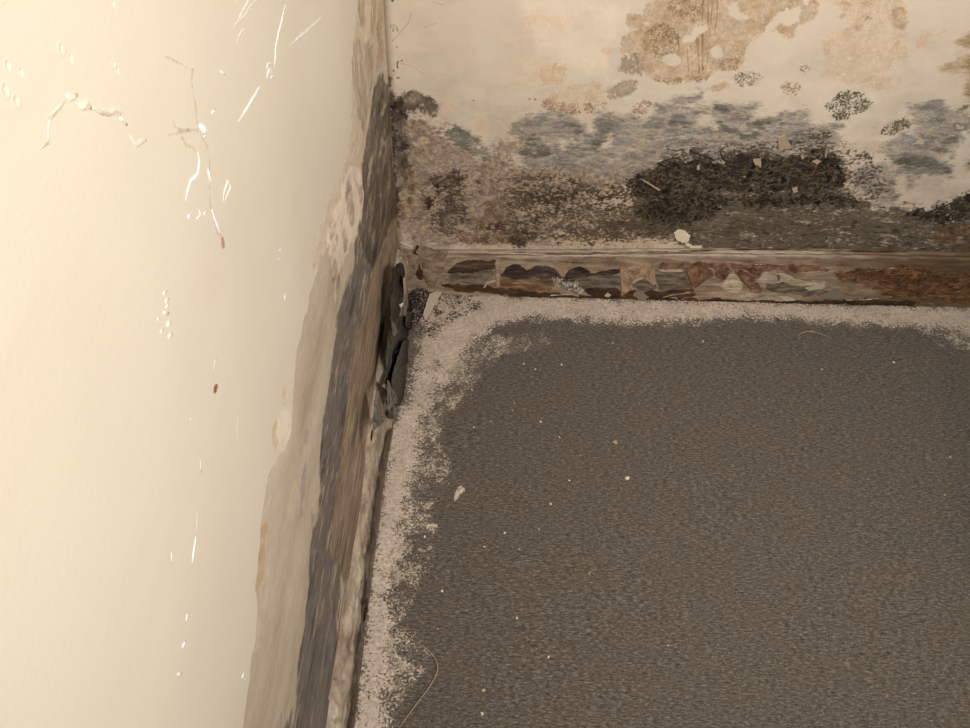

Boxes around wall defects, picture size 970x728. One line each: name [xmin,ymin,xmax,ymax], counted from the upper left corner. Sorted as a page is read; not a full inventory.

crack [40,92,147,149]
crack [185,123,211,201]
crack [212,210,225,249]
peeling [674,229,702,248]
peeling [398,233,695,320]
peeling [721,271,849,301]
leakage [243,0,970,728]